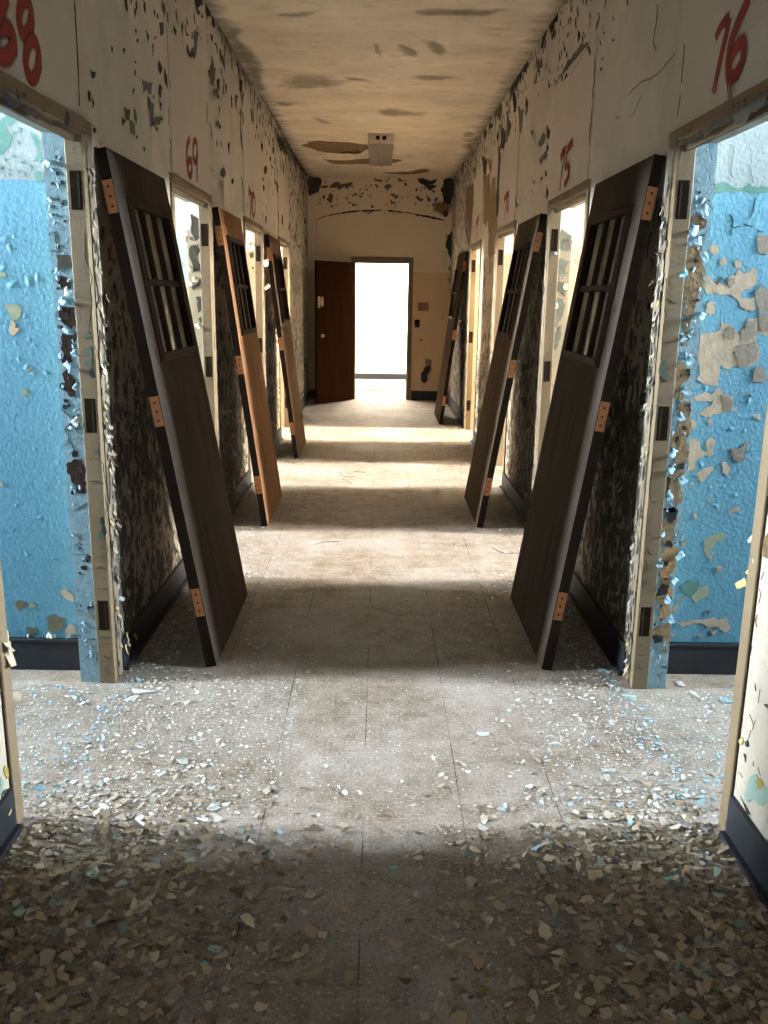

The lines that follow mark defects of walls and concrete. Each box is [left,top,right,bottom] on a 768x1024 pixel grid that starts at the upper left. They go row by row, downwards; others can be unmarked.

peeling [3,304,22,336]
peeling [0,88,70,188]
peeling [54,165,138,654]
peeling [111,46,168,132]
spalling [122,0,614,527]
spalling [629,176,768,669]
peeling [0,444,768,1024]